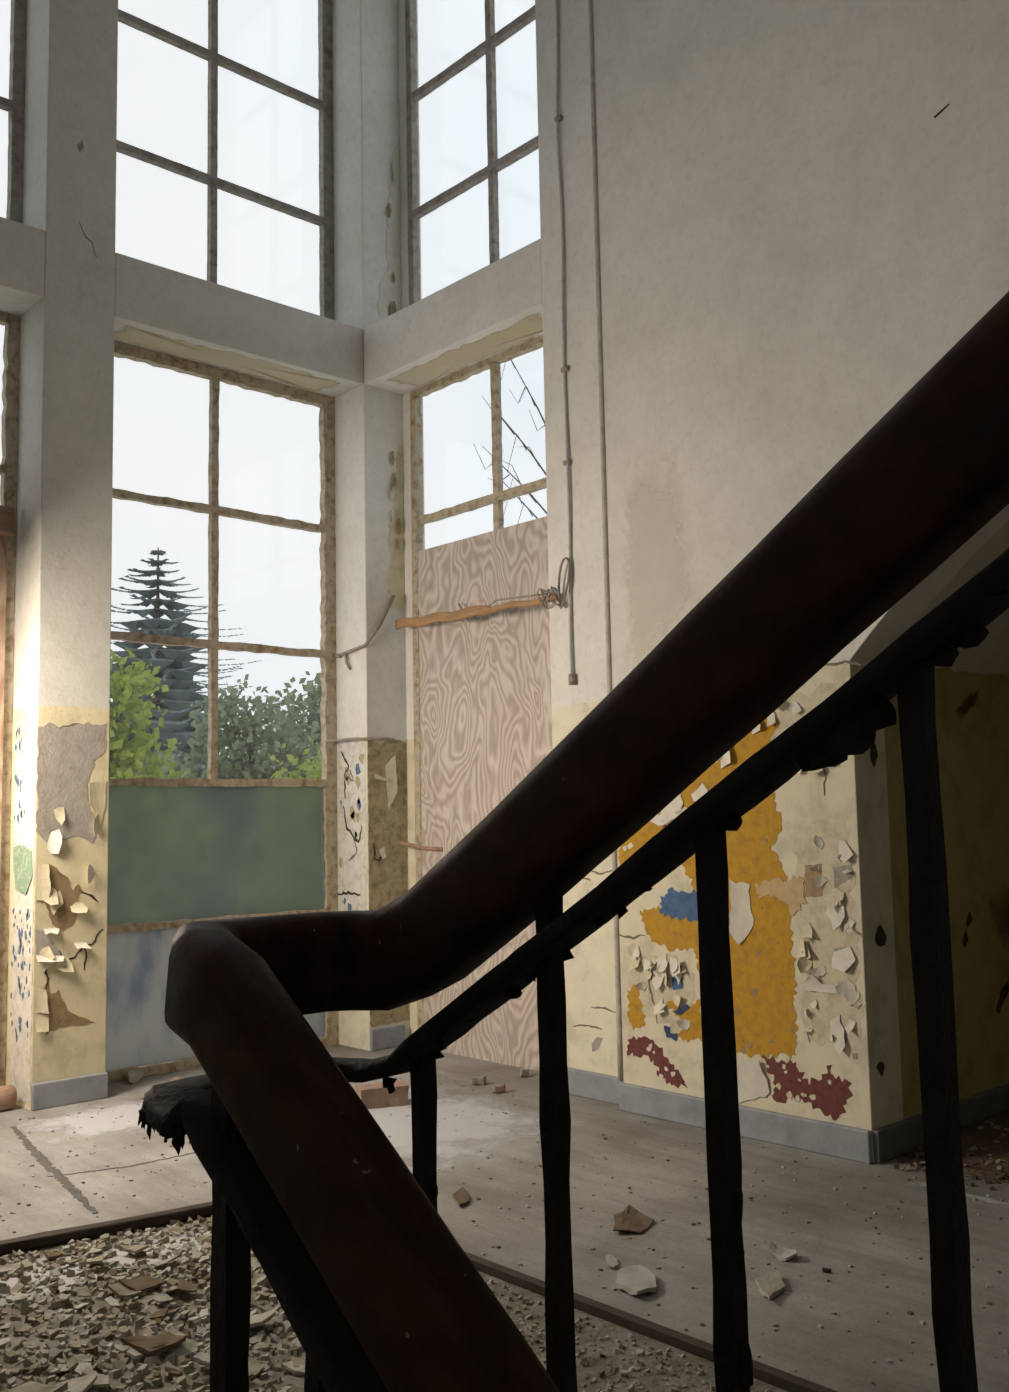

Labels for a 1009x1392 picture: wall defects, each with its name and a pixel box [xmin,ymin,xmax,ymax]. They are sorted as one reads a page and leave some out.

peeling [10,722,107,1104]
peeling [337,738,408,911]
peeling [370,1004,409,1026]
peeling [592,854,702,1088]
peeling [618,683,837,865]
peeling [726,792,887,1120]